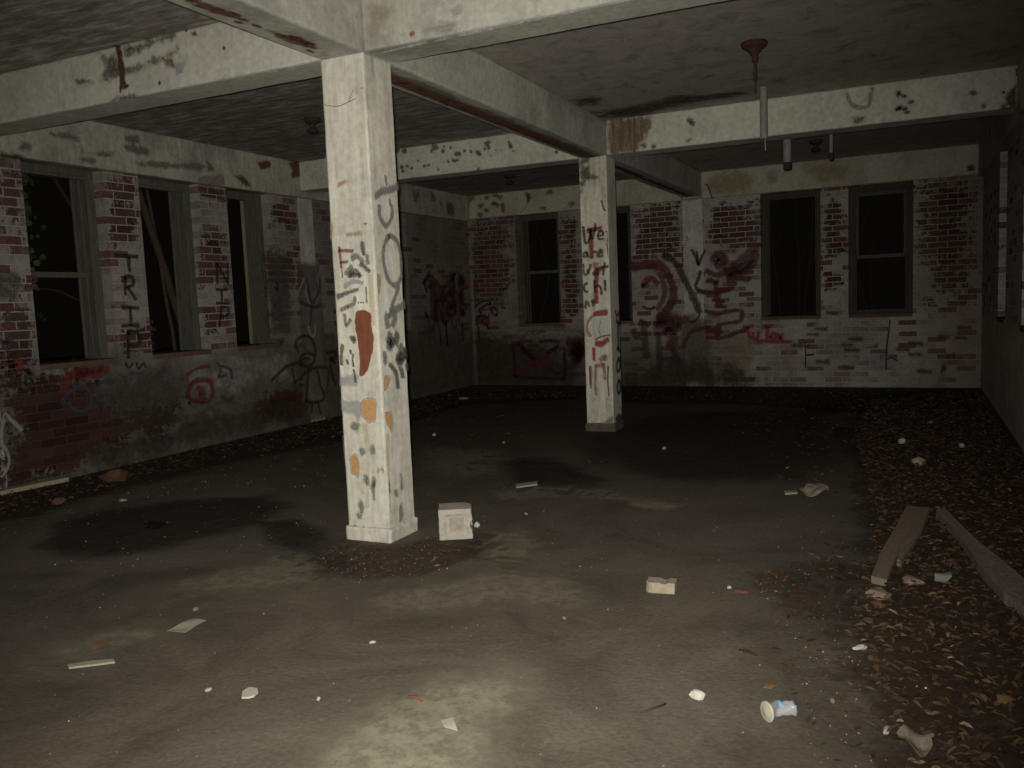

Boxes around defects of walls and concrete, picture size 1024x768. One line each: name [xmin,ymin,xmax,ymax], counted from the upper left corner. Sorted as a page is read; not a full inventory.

rust [115,45,129,93]
peeling [0,163,27,254]
peeling [471,193,524,311]
peeling [615,165,761,268]
peeling [910,165,978,314]